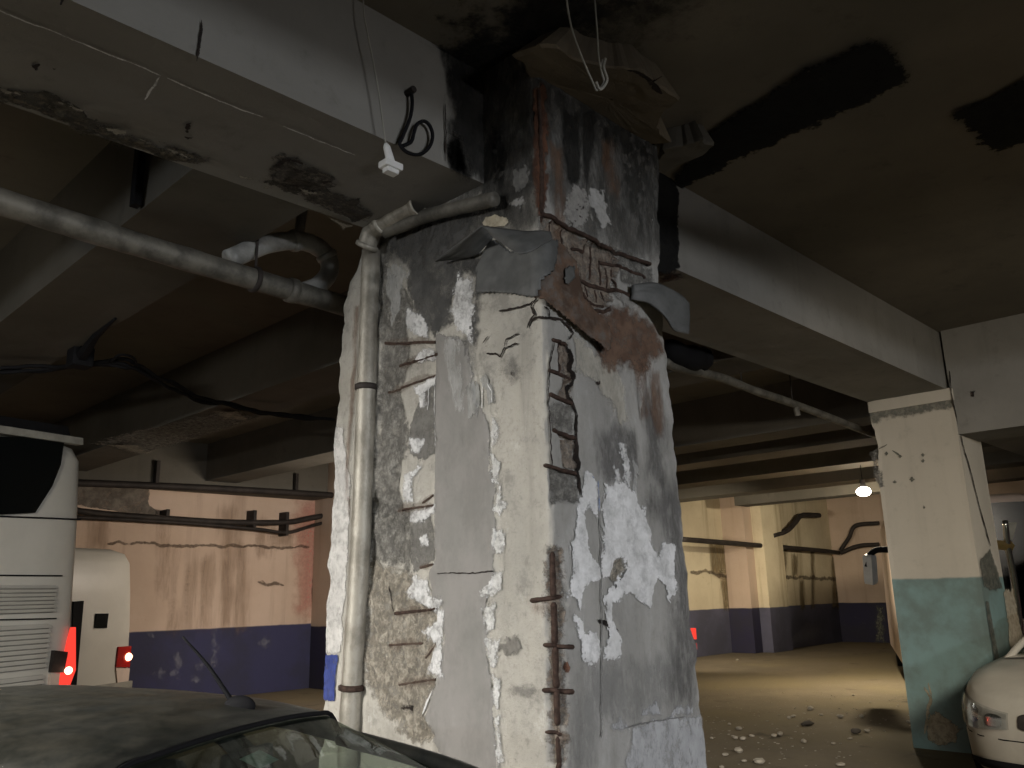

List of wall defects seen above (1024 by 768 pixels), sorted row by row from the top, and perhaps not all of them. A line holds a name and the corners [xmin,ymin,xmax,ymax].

water stain [447,139,468,177]
crack [483,298,574,357]
corrosion [596,306,664,374]
spalling [363,261,438,744]
crack [108,541,309,550]
peeling [530,338,678,768]
crack [986,601,999,660]